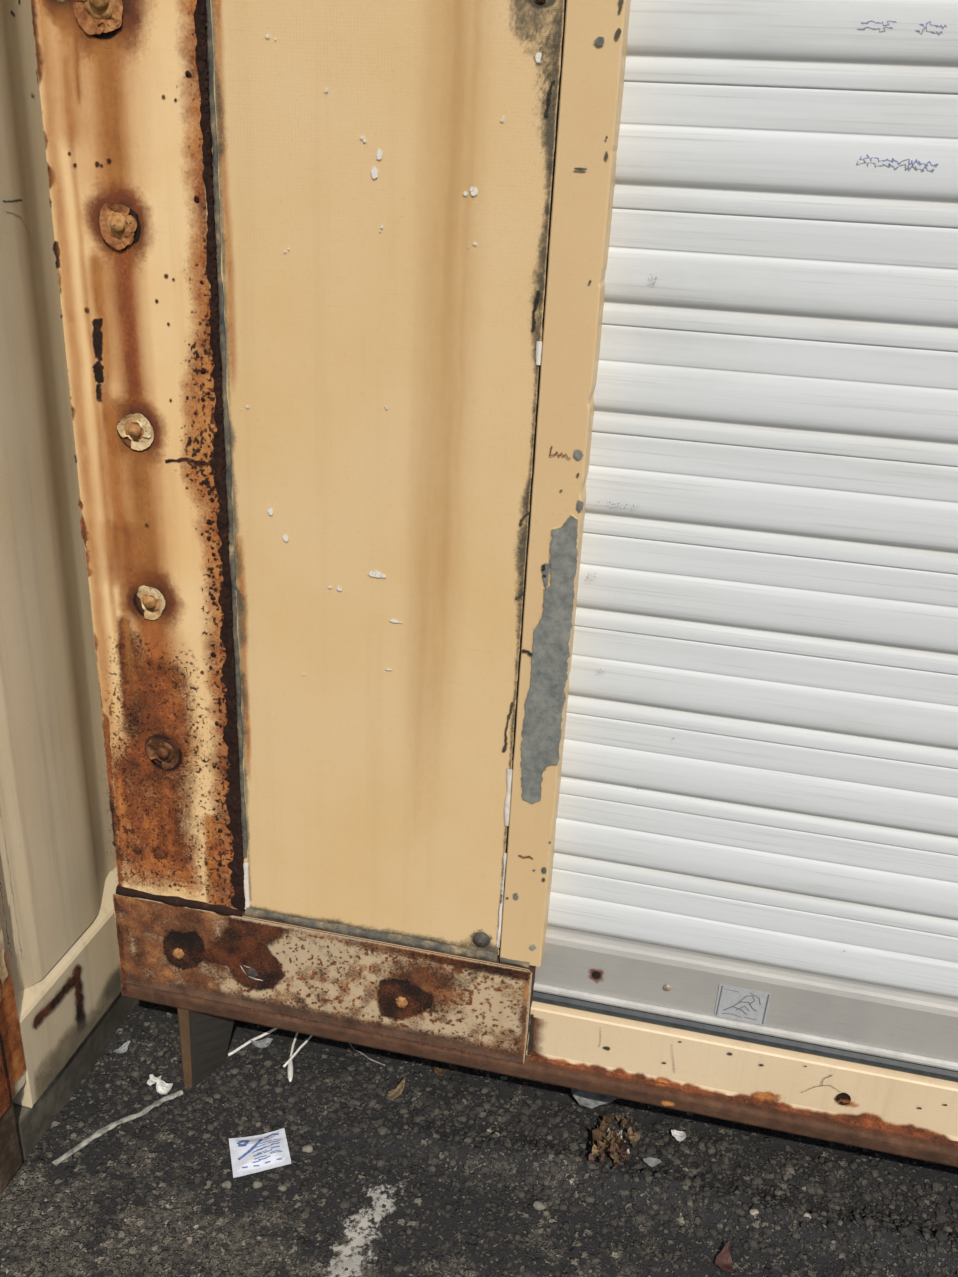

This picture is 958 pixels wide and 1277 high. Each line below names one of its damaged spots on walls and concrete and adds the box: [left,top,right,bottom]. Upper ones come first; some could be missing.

corrosion [0,952,26,1118]
corrosion [31,0,199,889]
corrosion [113,0,958,1145]
peeling [521,500,584,804]